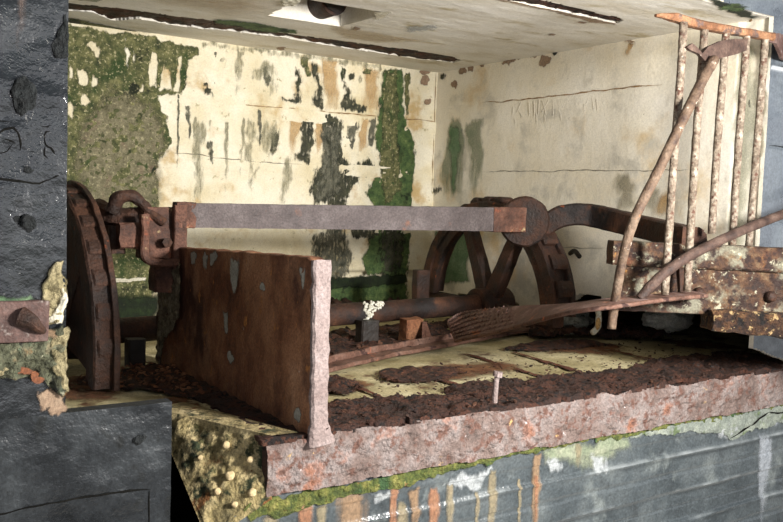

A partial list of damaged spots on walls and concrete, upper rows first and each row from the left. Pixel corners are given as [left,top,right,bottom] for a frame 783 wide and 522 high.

leakage [323,57,355,99]
leakage [364,62,381,102]
crack [482,85,655,103]
leakage [282,113,376,205]
leakage [311,229,379,278]
spalling [0,261,70,416]
rust [326,316,783,429]
crack [731,412,783,438]
crack [0,489,150,522]
rust [390,488,420,522]
rust [429,484,454,522]
rust [532,455,541,522]